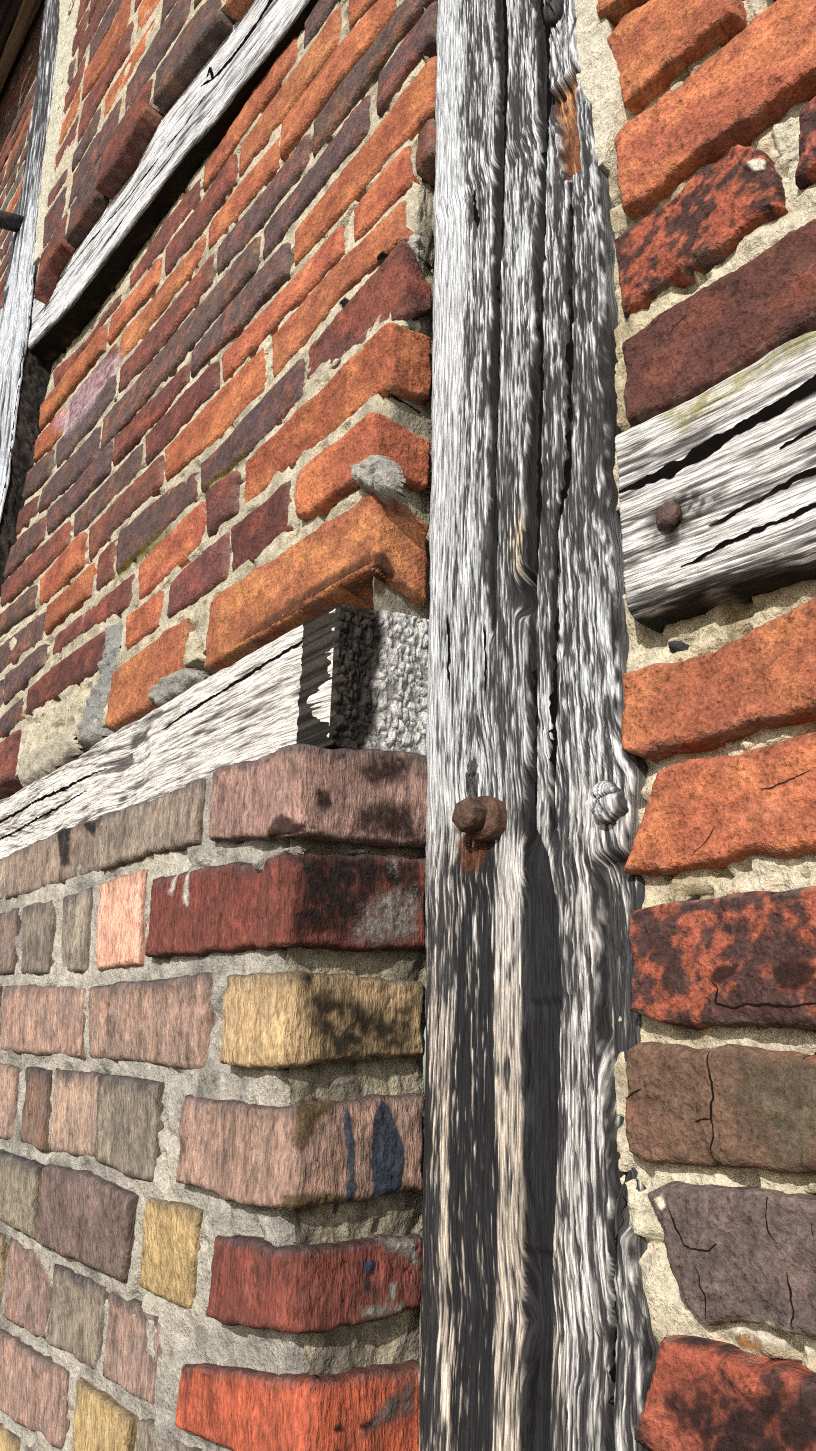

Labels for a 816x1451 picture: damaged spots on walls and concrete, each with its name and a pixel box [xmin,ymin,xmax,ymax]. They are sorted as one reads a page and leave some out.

crack [473,0,574,813]
crack [618,374,816,567]
rust [455,827,486,871]
crack [694,1050,715,1161]
crack [765,1197,801,1335]